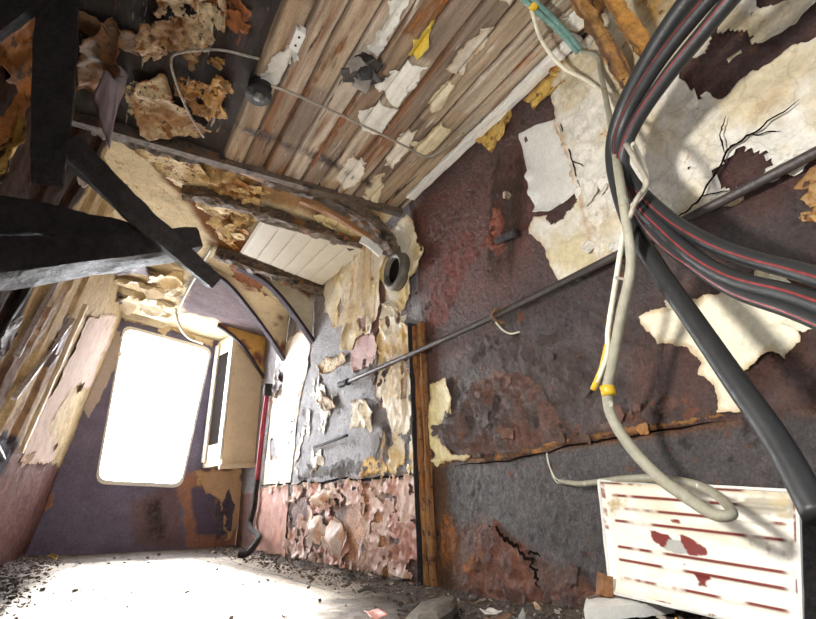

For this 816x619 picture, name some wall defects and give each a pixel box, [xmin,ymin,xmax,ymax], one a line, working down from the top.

peeling [76,0,252,150]
peeling [518,9,623,281]
peeling [630,37,816,223]
crack [679,99,800,216]
peeling [252,213,424,580]
rust [430,325,614,463]
crack [457,421,716,466]
rust [615,394,724,435]
peeling [639,300,741,413]
peeling [692,292,811,371]
rust [214,489,235,540]
rust [441,516,614,610]